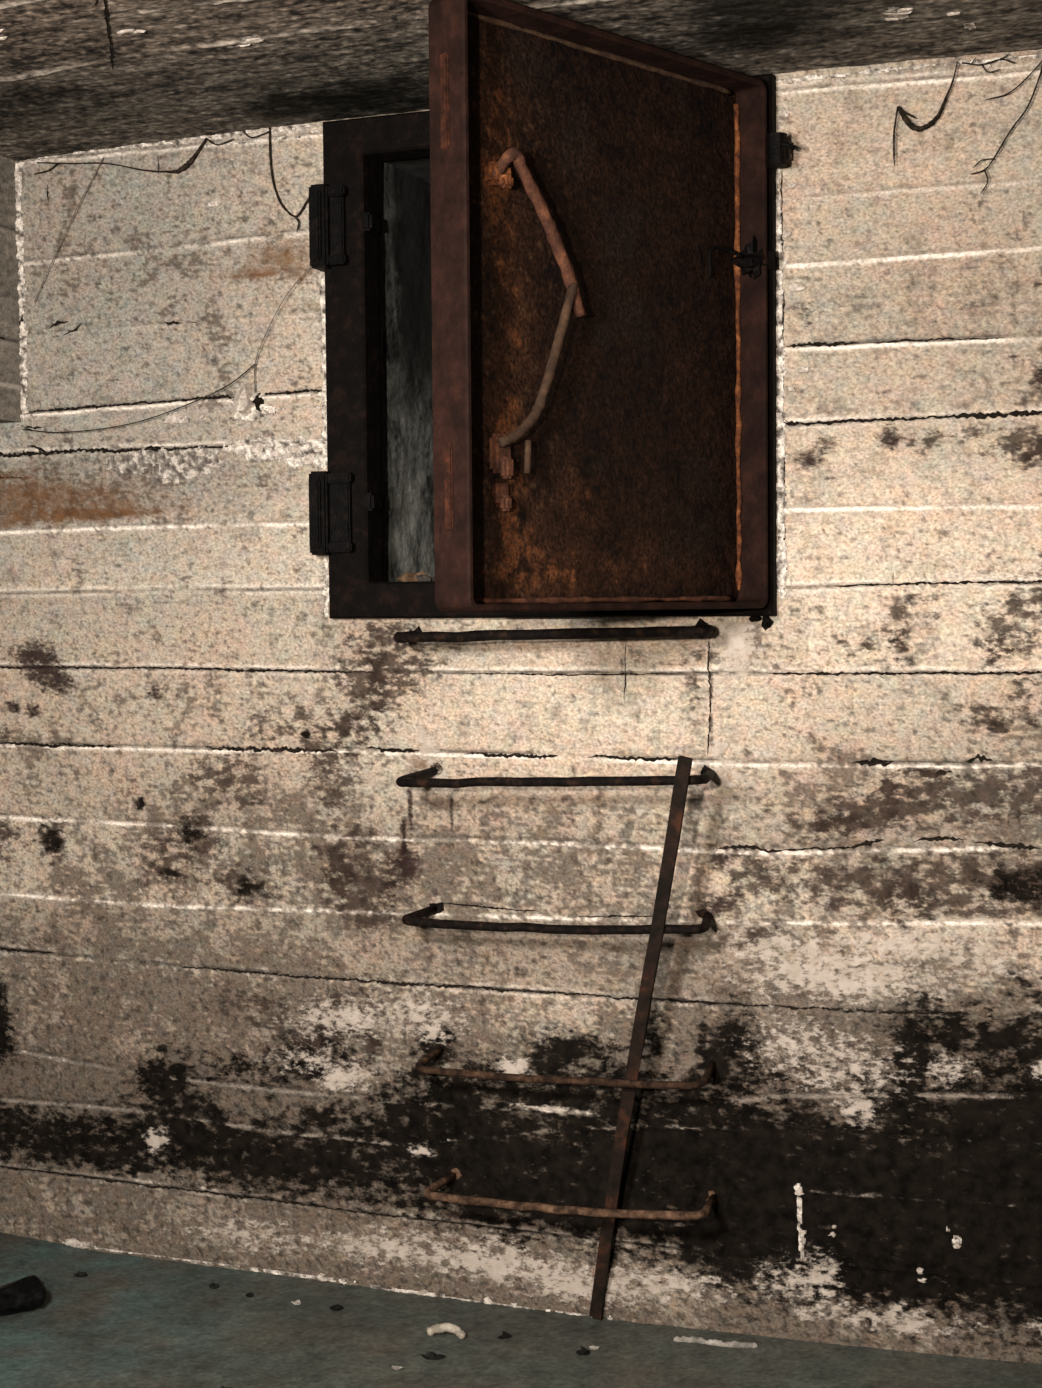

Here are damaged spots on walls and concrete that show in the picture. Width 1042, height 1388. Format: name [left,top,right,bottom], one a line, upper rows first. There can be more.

leakage [880,424,1042,470]
leakage [837,590,939,666]
leakage [973,575,1042,669]
leakage [0,640,74,739]
leakage [953,678,1038,733]
leakage [131,622,457,933]
rust [391,787,421,880]
rust [710,847,740,869]
rust [700,892,744,917]
rust [411,1025,457,1076]
leakage [0,761,1042,1354]
rust [688,1006,746,1093]